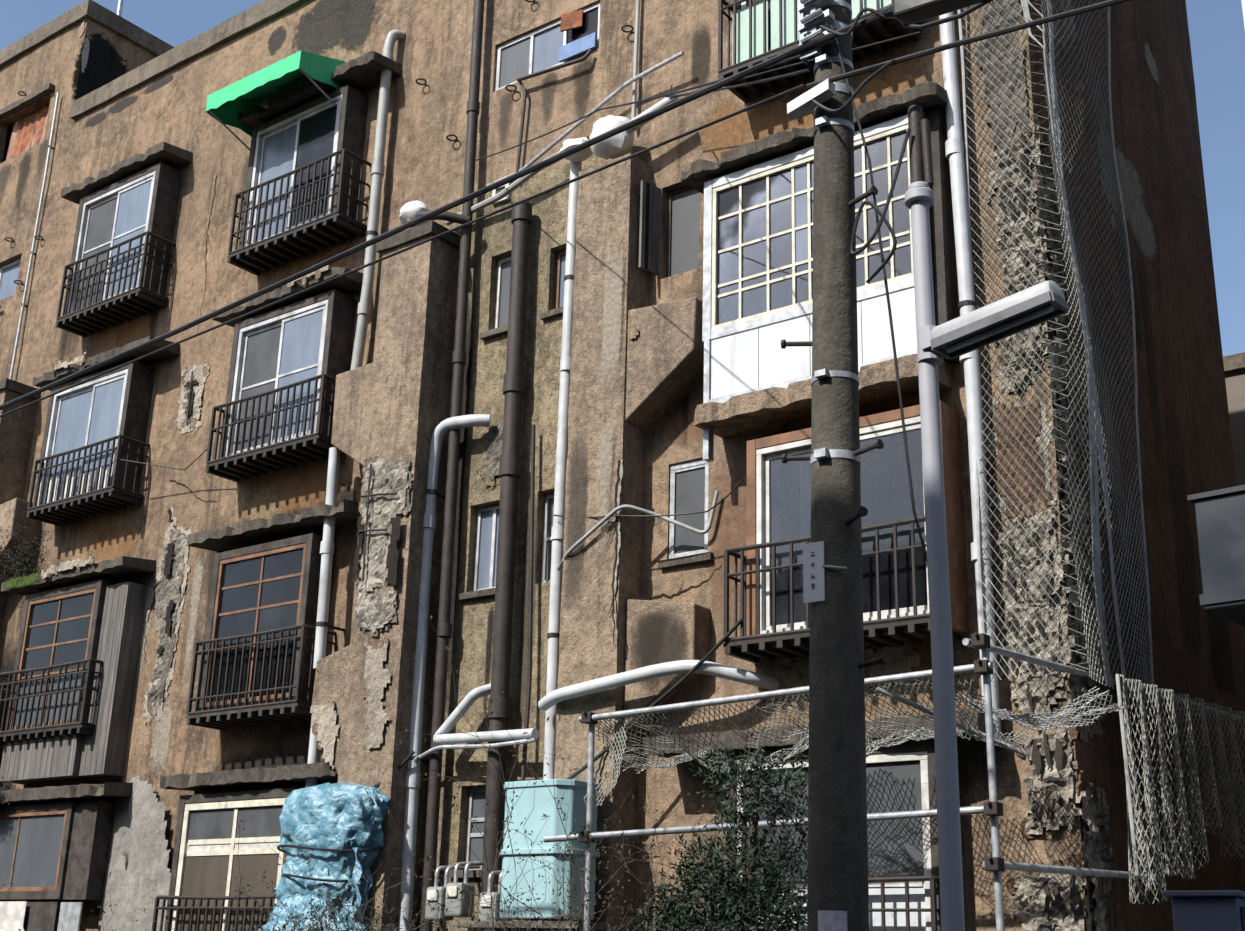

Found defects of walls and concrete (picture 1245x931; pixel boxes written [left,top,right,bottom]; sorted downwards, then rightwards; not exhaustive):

spalling [143,522,192,722]
spalling [175,363,210,434]
spalling [352,456,414,749]
crack [605,460,623,645]
crack [649,565,722,600]
spalling [976,0,1116,931]